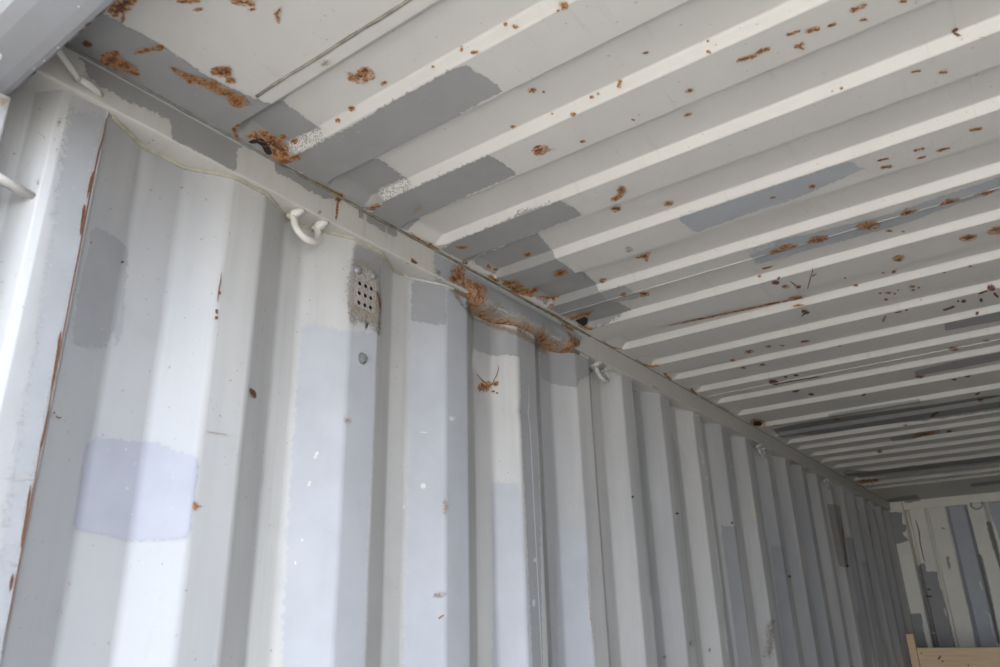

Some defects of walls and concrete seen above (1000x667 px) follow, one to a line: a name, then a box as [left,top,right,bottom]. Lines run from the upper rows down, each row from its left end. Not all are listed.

rust [78,0,164,76]
rust [736,47,770,62]
rust [169,66,251,108]
rust [347,67,387,86]
rust [231,124,301,164]
rust [531,145,551,157]
rust [609,186,625,213]
rust [855,220,905,232]
rust [435,246,548,355]
rust [486,264,596,332]
rust [670,234,829,326]
rust [476,365,499,394]